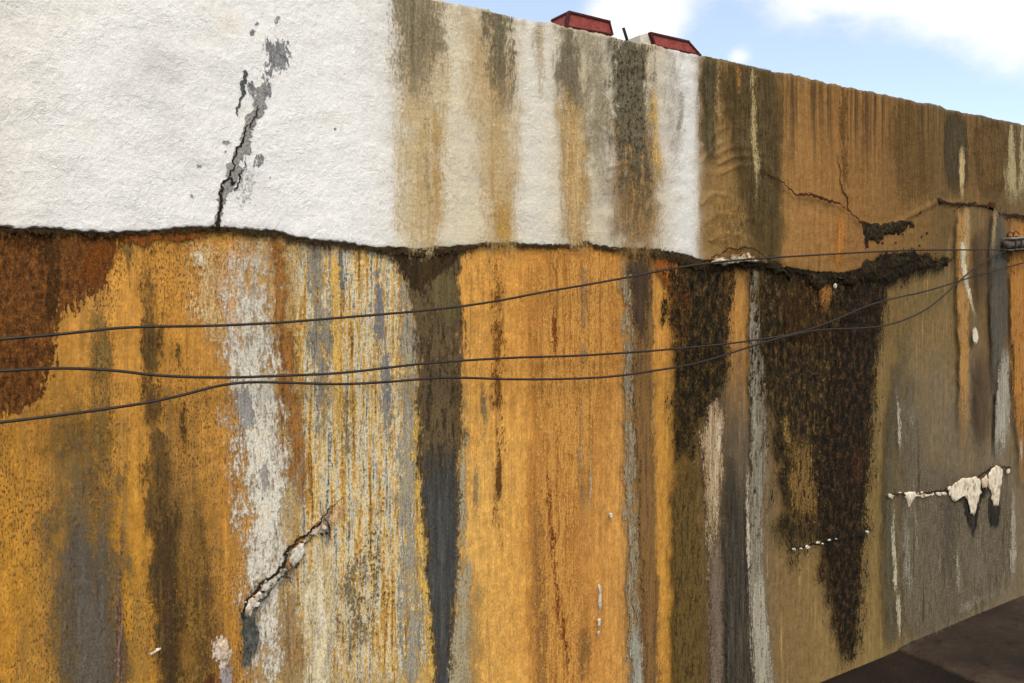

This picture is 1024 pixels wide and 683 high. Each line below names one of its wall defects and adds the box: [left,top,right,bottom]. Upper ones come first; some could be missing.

crack [190,16,292,228]
crack [764,158,864,224]
crack [937,197,1024,225]
corrosion [0,231,213,418]
damp [21,0,520,683]
damp [531,23,1024,683]
corrosion [518,244,624,683]
crack [238,499,348,668]